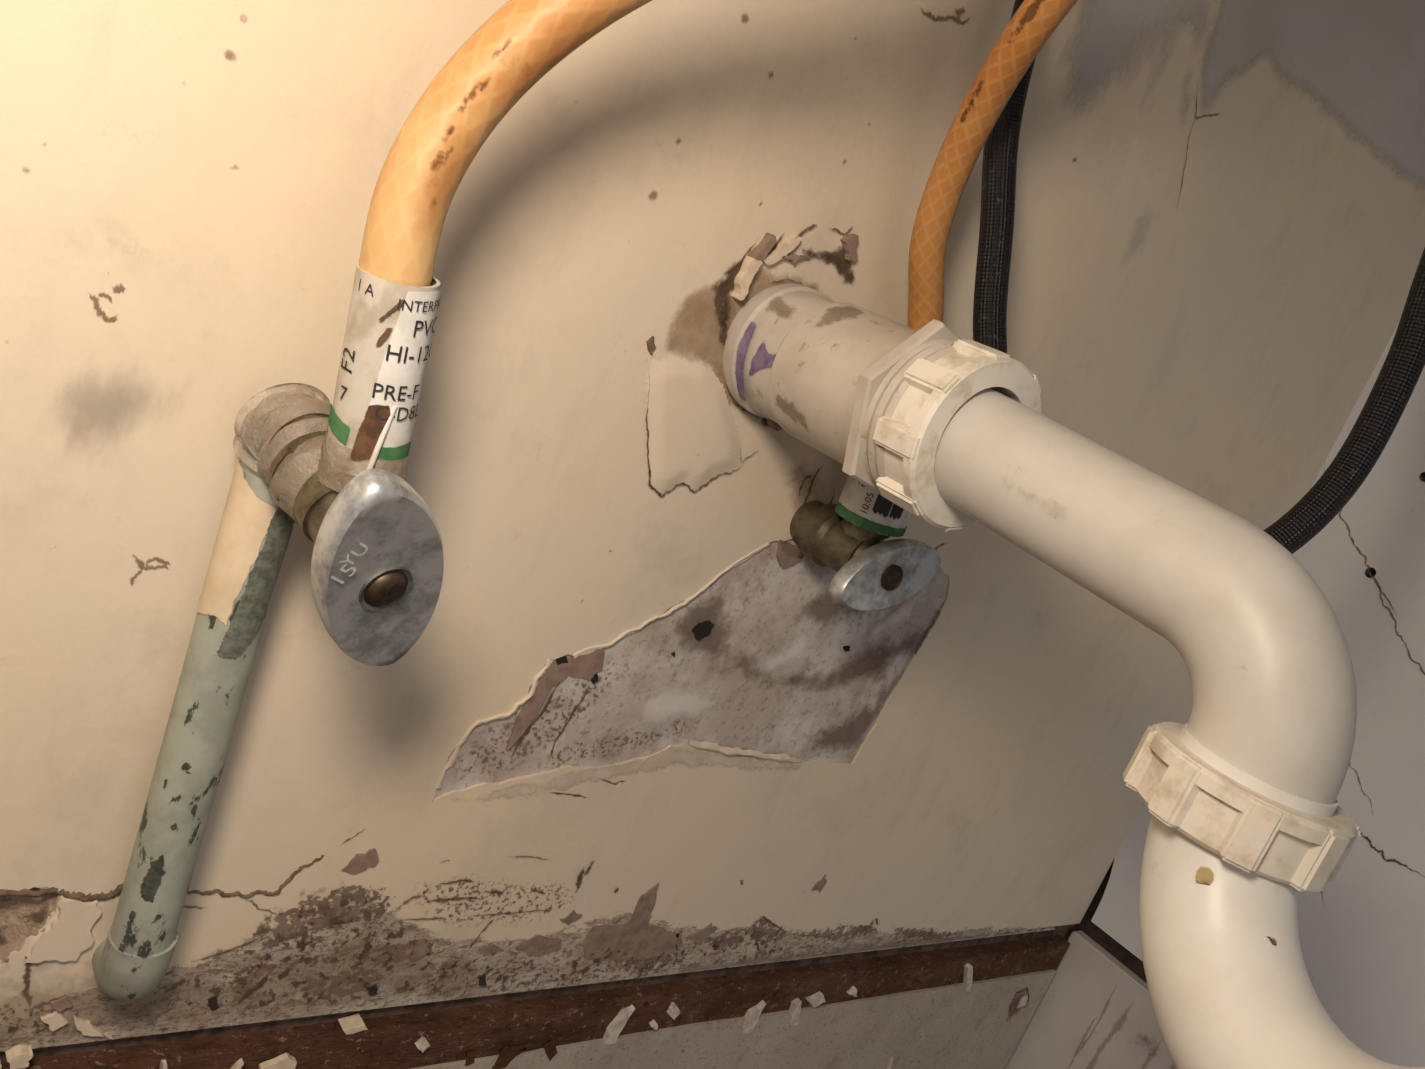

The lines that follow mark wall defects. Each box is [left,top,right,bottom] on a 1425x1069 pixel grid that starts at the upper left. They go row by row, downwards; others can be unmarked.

spalling [669,224,859,431]
peeling [434,539,948,800]
crack [1339,510,1425,675]
crack [184,832,361,914]
crack [1349,764,1421,875]
crack [22,957,59,1009]
peeling [0,848,1056,1069]